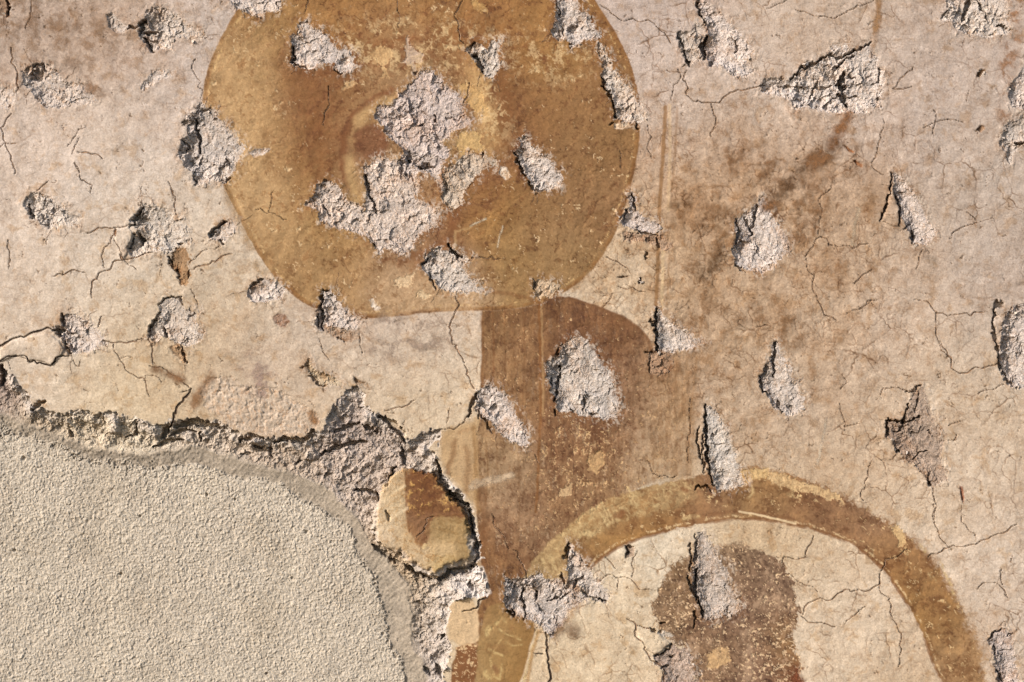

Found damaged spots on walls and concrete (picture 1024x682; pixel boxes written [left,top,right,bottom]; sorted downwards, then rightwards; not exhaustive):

spalling [177,101,270,191]
spalling [304,30,564,303]
spalling [543,0,647,130]
crack [671,70,765,136]
spalling [677,0,893,122]
crack [0,327,80,370]
crack [56,226,190,429]
spalling [546,336,629,422]
spalling [695,401,845,506]
crack [932,487,1017,554]
crack [782,536,907,667]
crack [534,634,552,682]